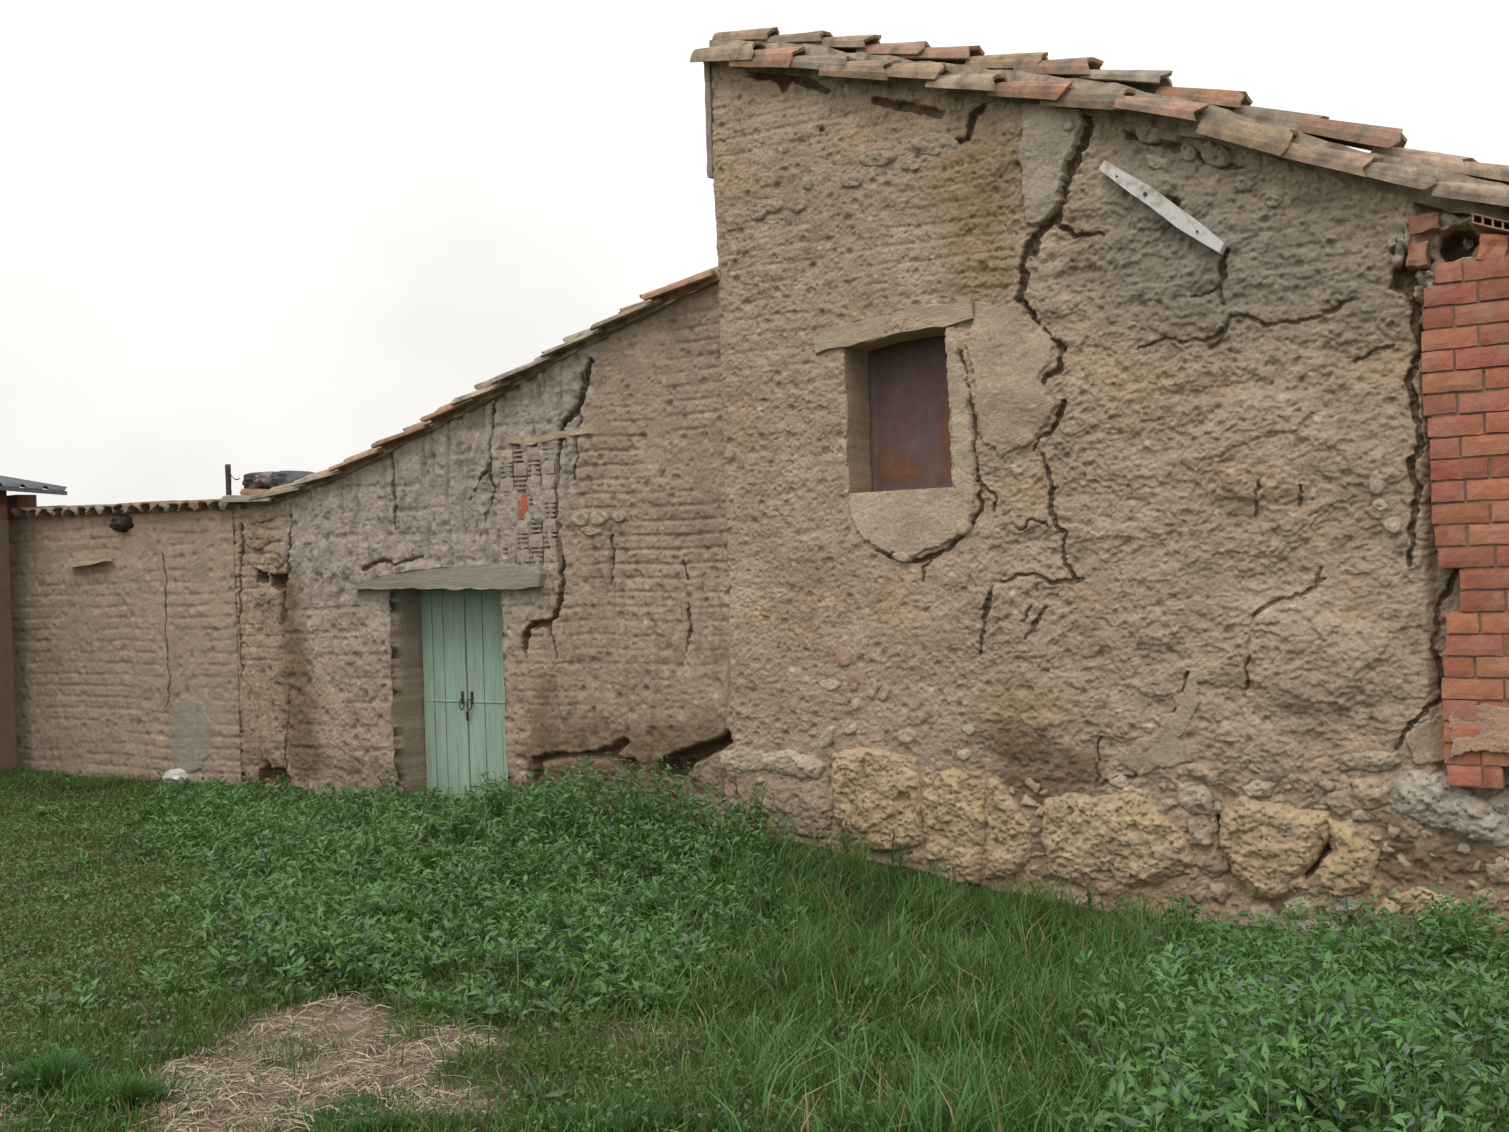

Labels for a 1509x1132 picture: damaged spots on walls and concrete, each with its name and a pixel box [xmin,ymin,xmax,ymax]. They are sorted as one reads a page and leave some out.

crack [521,358,595,659]
crack [876,113,1106,655]
crack [1137,249,1353,350]
crack [1353,289,1425,567]
crack [1394,568,1460,750]